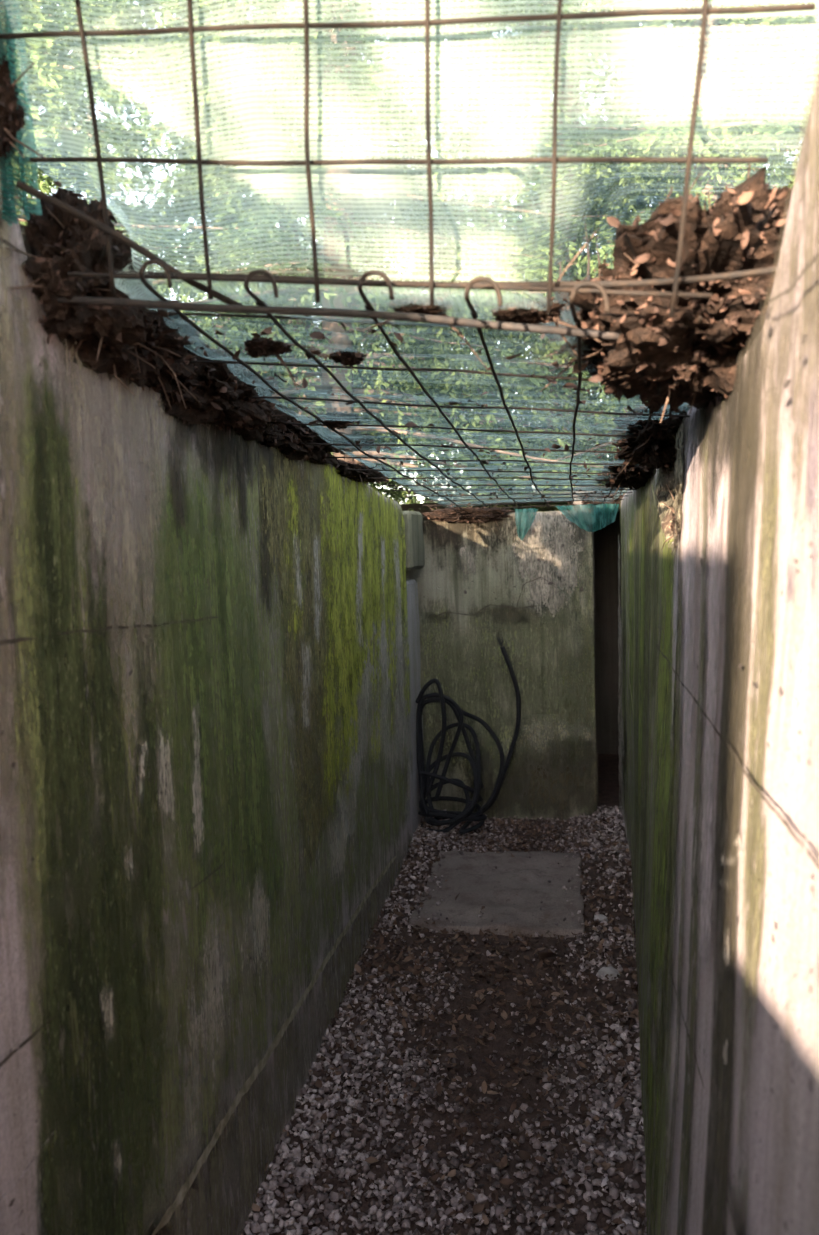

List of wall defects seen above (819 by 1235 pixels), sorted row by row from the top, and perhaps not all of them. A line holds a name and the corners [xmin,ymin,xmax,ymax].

crack [0,616,219,645]
damp [86,506,168,1104]
damp [168,416,274,1016]
damp [430,523,517,578]
damp [458,514,597,820]
damp [622,509,659,841]
damp [646,46,819,1235]
crack [664,655,819,869]
crack [0,1015,56,1068]
damp [149,835,412,1235]